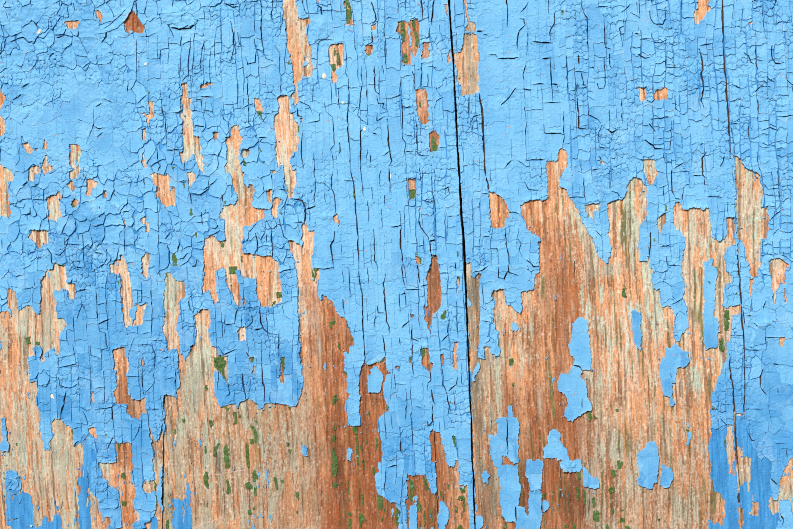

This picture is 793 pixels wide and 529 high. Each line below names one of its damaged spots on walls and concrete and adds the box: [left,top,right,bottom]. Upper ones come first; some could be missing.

peeling [140,83,205,207]
peeling [194,0,313,307]
peeling [415,89,440,152]
peeling [447,0,480,96]
crack [468,0,682,198]
peeling [638,87,668,102]
crack [645,0,793,219]
crack [145,434,165,529]
crack [256,0,458,527]
peeling [0,140,793,529]
crack [475,212,539,297]
crack [721,252,778,526]